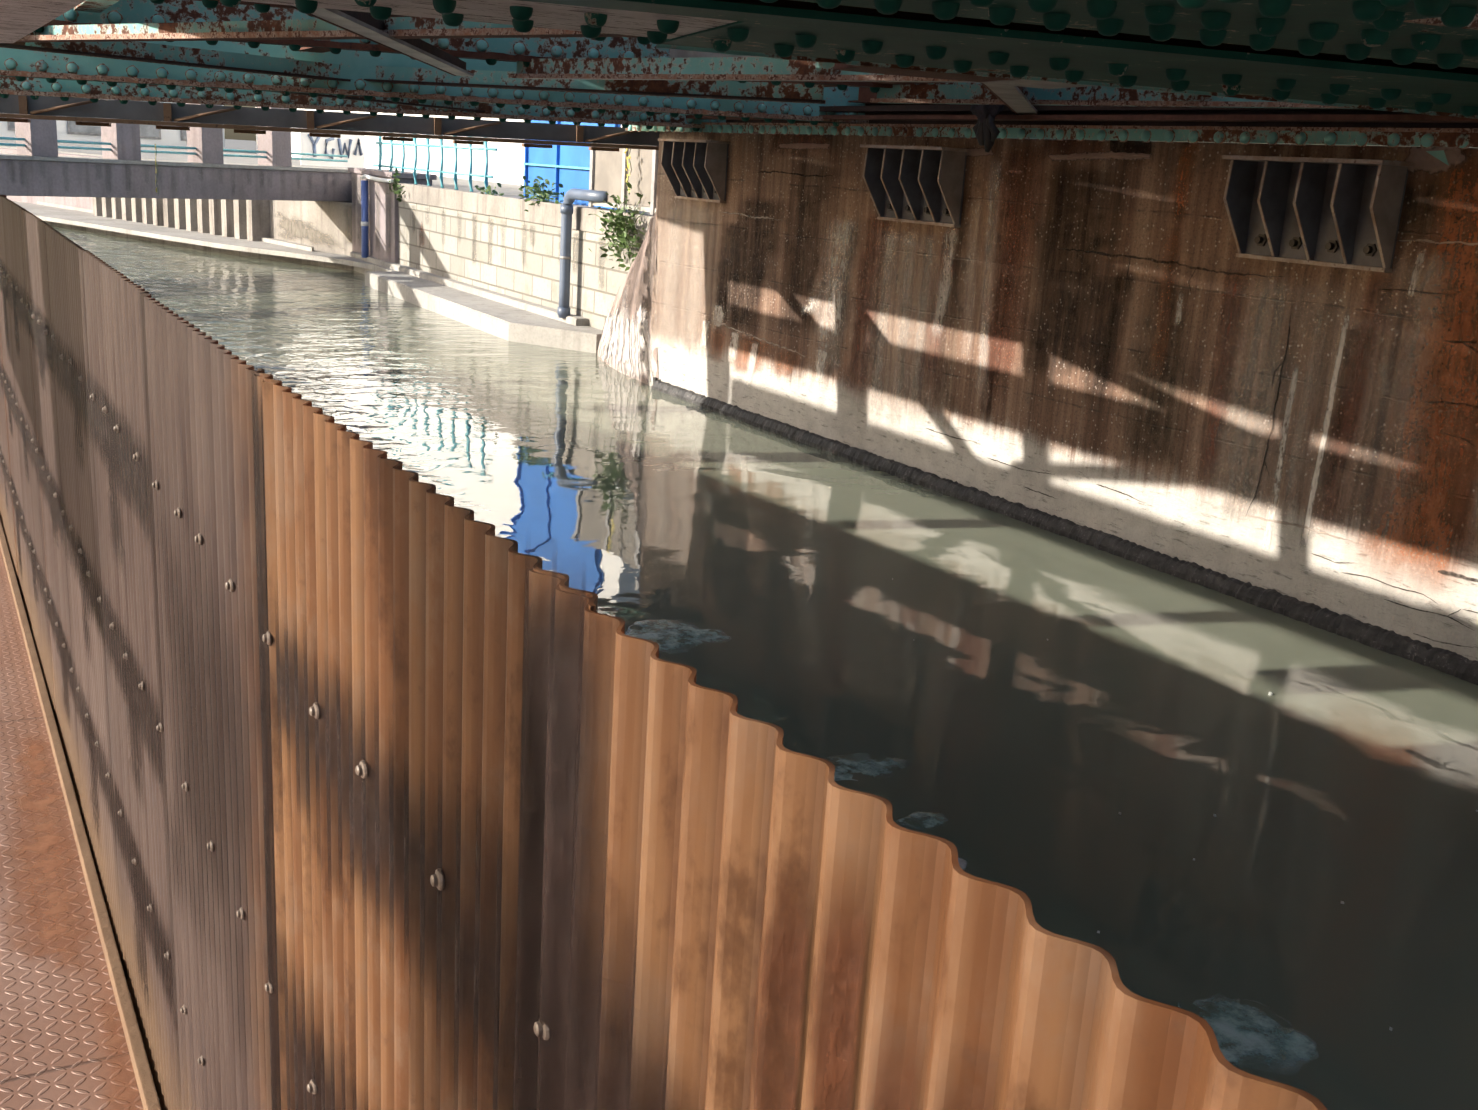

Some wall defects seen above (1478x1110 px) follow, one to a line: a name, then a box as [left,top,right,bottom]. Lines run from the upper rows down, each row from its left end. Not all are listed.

water stain [689,164,854,384]
water stain [1264,372,1297,545]
water stain [1302,323,1360,541]
crack [1246,315,1478,648]
corrosion [254,423,281,1110]
water stain [276,649,516,1110]
corrosion [513,630,595,1110]